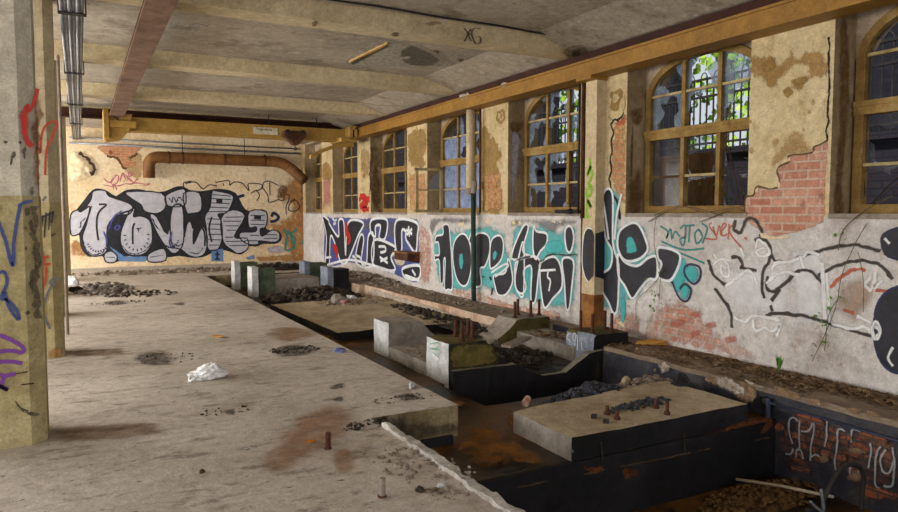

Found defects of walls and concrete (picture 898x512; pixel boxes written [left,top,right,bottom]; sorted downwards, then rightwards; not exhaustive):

water stain [750,52,828,98]
crack [824,37,832,141]
spalling [98,146,143,170]
rust [257,181,304,261]
peeling [481,127,503,224]
crack [608,107,625,220]
spalling [612,114,627,202]
spalling [744,140,828,240]
spalling [608,301,752,361]
rust [458,423,539,464]